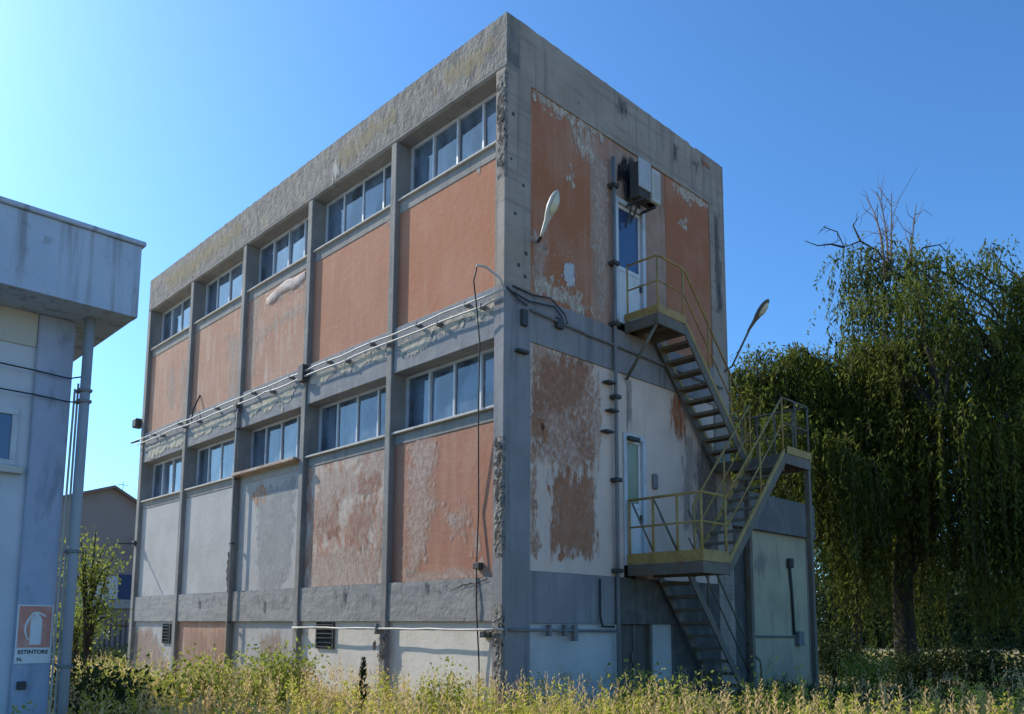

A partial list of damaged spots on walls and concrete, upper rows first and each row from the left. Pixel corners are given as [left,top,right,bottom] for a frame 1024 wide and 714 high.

spalling [472,70,508,180]
peeling [531,88,612,318]
peeling [309,471,380,587]
peeling [404,435,506,582]
peeling [530,343,602,562]
corrosion [670,396,686,445]